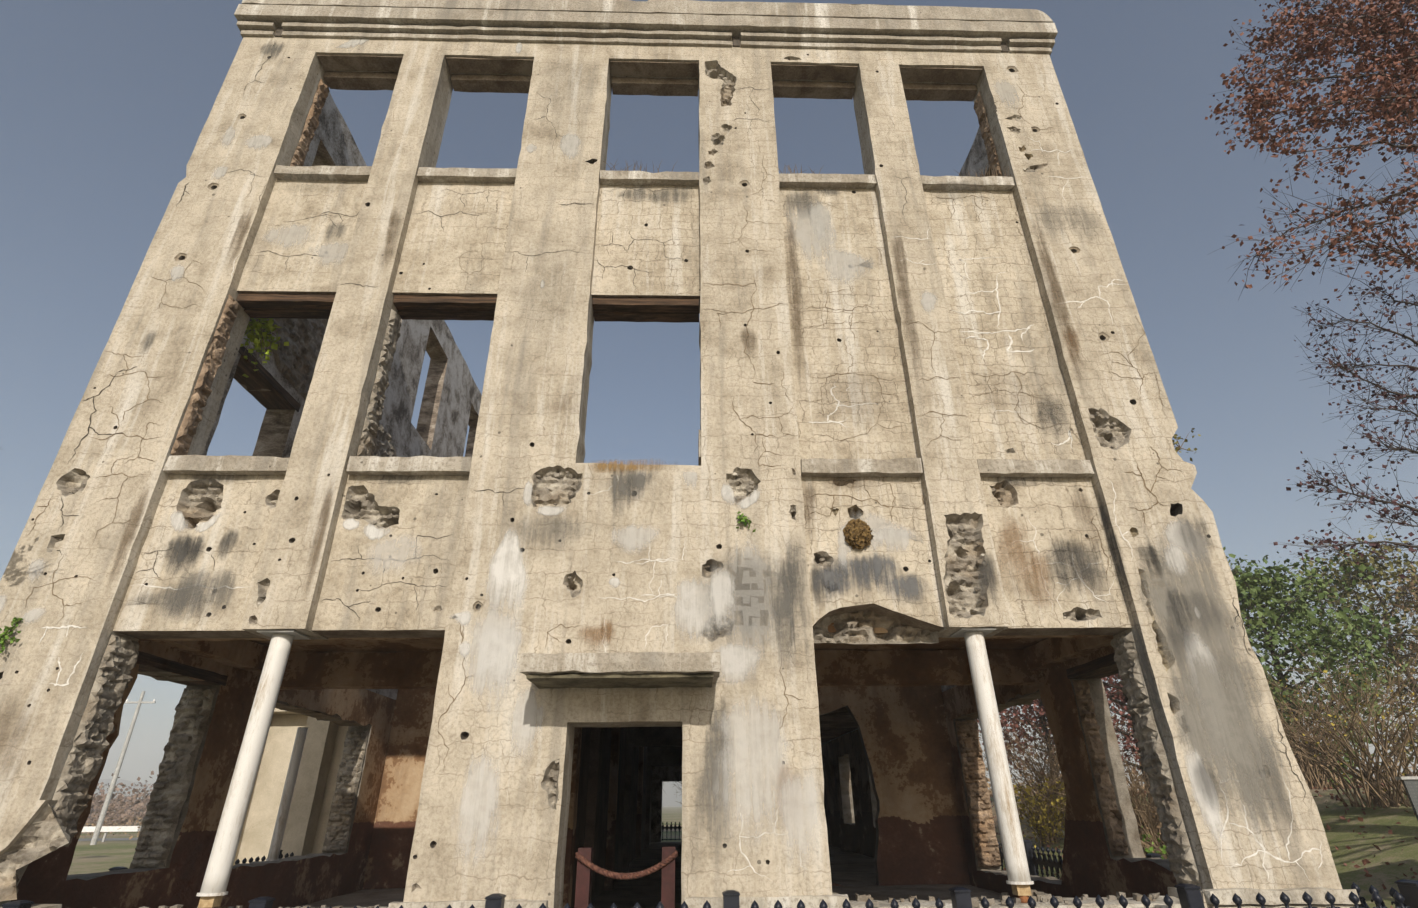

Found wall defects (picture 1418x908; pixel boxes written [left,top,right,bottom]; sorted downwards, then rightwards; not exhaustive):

crack [514,87,1072,467]
crack [1058,279,1170,409]
crack [25,351,170,686]
leakage [142,512,231,611]
spalling [176,478,224,529]
leakage [220,532,237,552]
spalling [342,485,400,529]
spalling [530,465,583,508]
leakage [676,528,922,681]
crack [803,483,924,527]
spalling [943,512,989,619]
leakage [1085,499,1274,838]